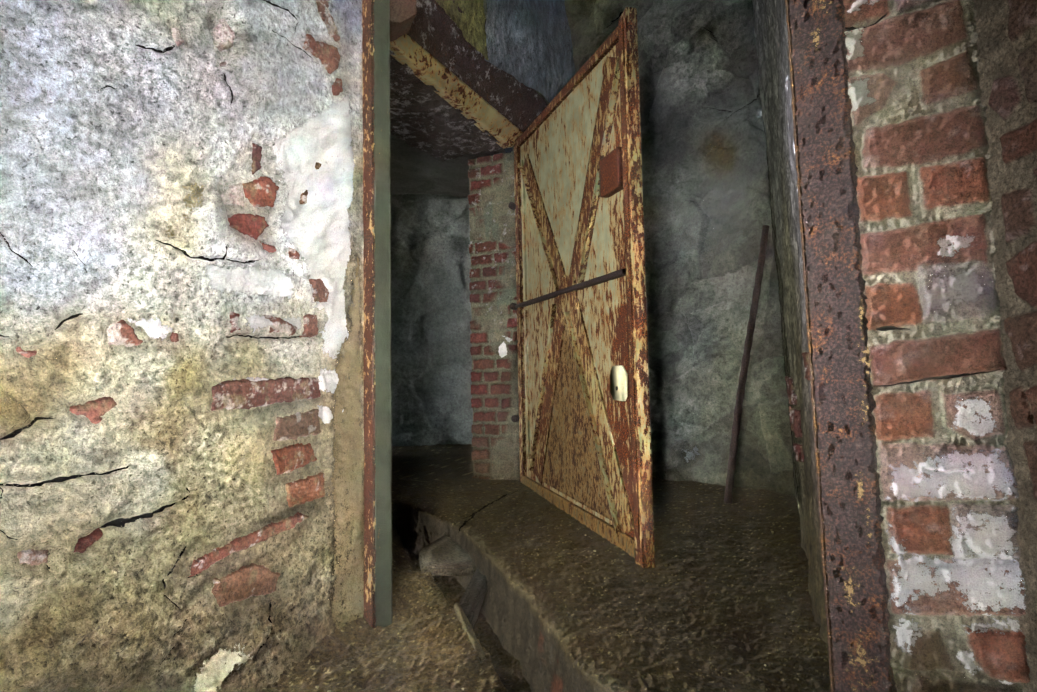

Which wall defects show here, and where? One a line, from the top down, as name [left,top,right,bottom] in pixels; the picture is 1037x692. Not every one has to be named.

crack [136,45,175,53]
crack [0,232,33,267]
crack [55,313,83,330]
spalling [91,300,192,363]
peeling [176,0,365,633]
spalling [56,386,128,433]
crack [0,417,54,440]
crack [0,465,130,499]
crack [99,488,190,528]